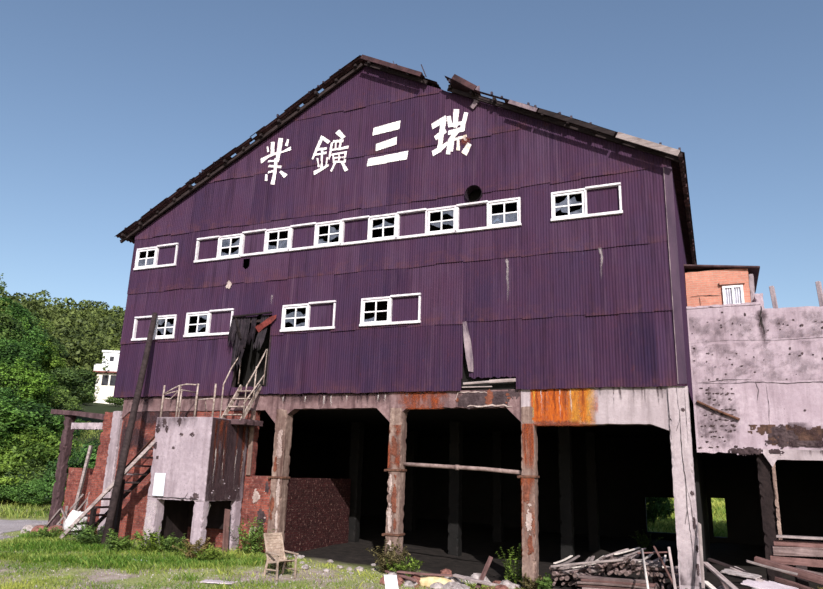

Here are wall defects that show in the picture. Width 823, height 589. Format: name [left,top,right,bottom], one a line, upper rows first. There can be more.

rust [388,442,400,468]
rust [401,391,446,409]
rust [522,388,592,464]
spalling [698,353,823,456]